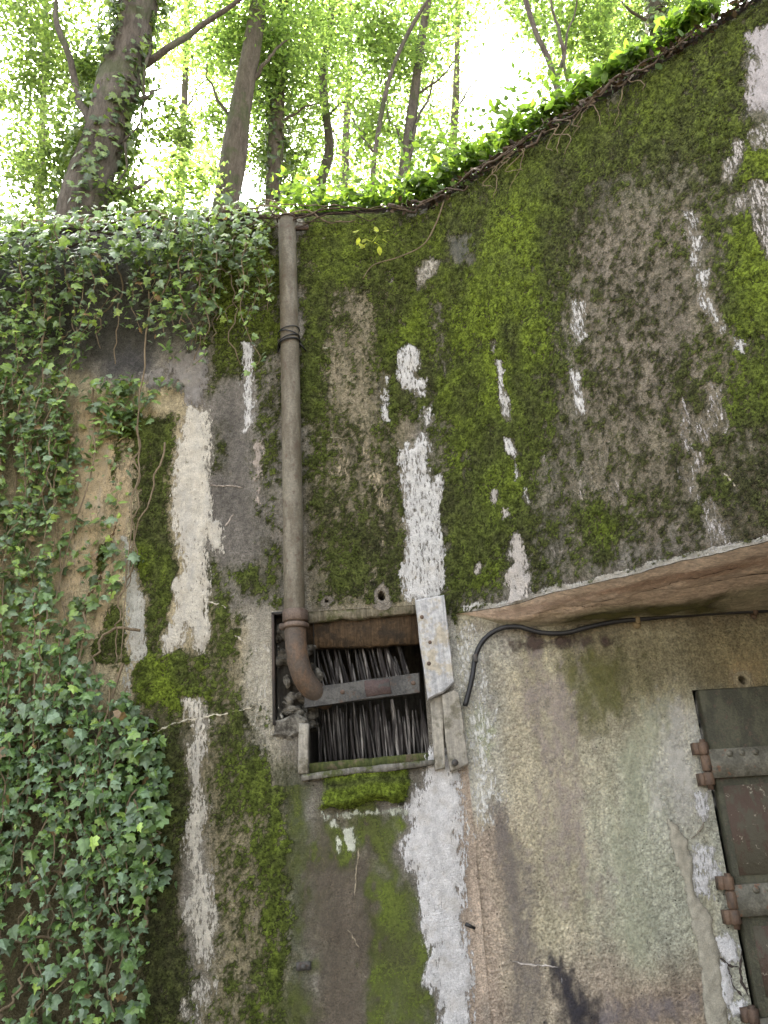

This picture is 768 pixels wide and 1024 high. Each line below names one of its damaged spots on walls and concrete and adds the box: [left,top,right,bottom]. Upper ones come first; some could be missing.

peeling [723,24,768,183]
spalling [733,179,768,259]
water stain [571,301,588,344]
water stain [321,343,768,1024]
peeling [694,788,711,822]
peeling [690,843,722,901]